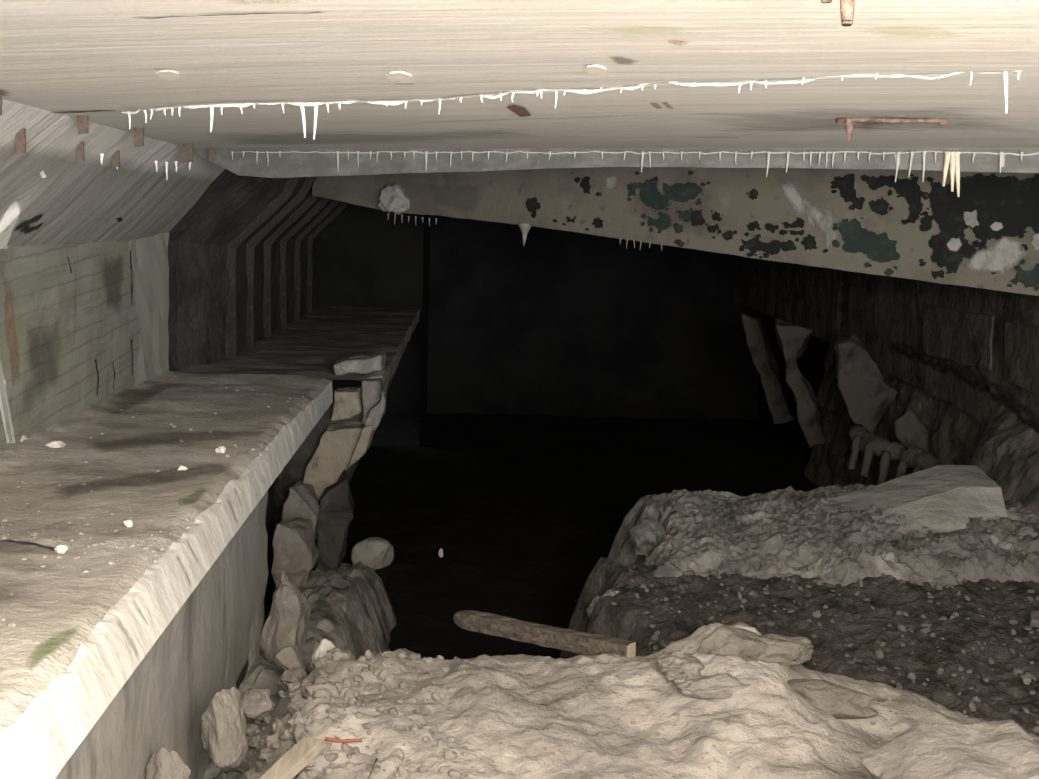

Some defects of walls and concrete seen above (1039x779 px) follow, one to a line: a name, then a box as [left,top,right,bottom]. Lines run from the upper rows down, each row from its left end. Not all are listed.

water stain [120,71,1021,247]
efflorescence [962,152,1039,173]
peeling [627,170,1039,291]
crack [0,539,56,551]